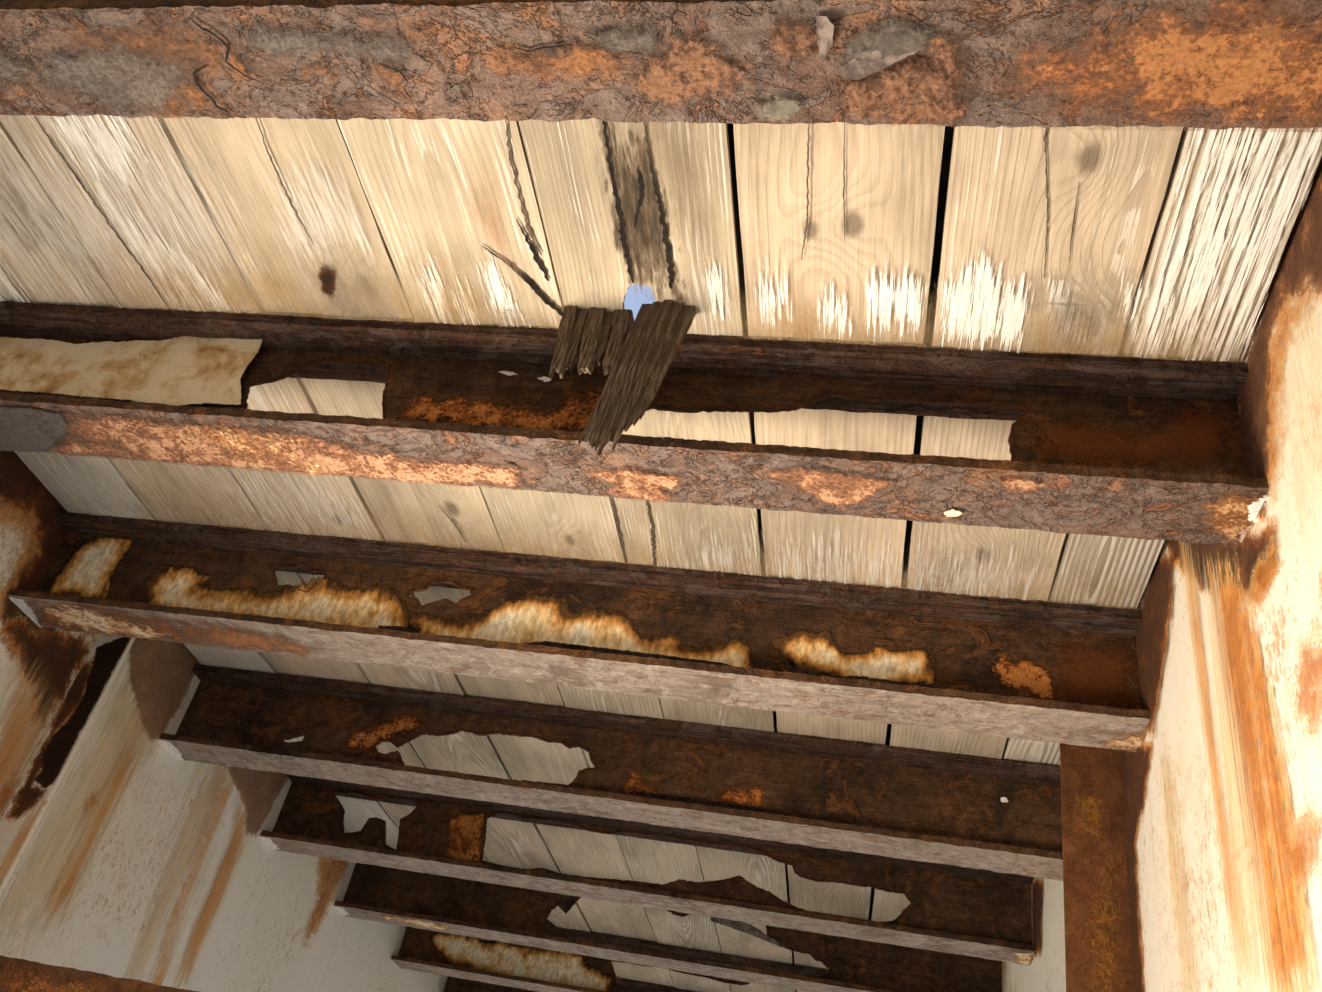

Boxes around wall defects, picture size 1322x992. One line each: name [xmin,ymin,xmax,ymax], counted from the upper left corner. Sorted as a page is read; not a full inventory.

corrosion [505,35,755,112]
corrosion [999,0,1322,132]
crack [482,120,564,316]
crack [595,120,687,305]
peeling [0,336,262,406]
corrosion [55,413,523,488]
peeling [48,537,133,599]
corrosion [0,450,317,883]
peeling [143,566,753,668]
peeling [770,630,936,685]
corrosion [992,157,1322,992]
peeling [383,914,614,992]